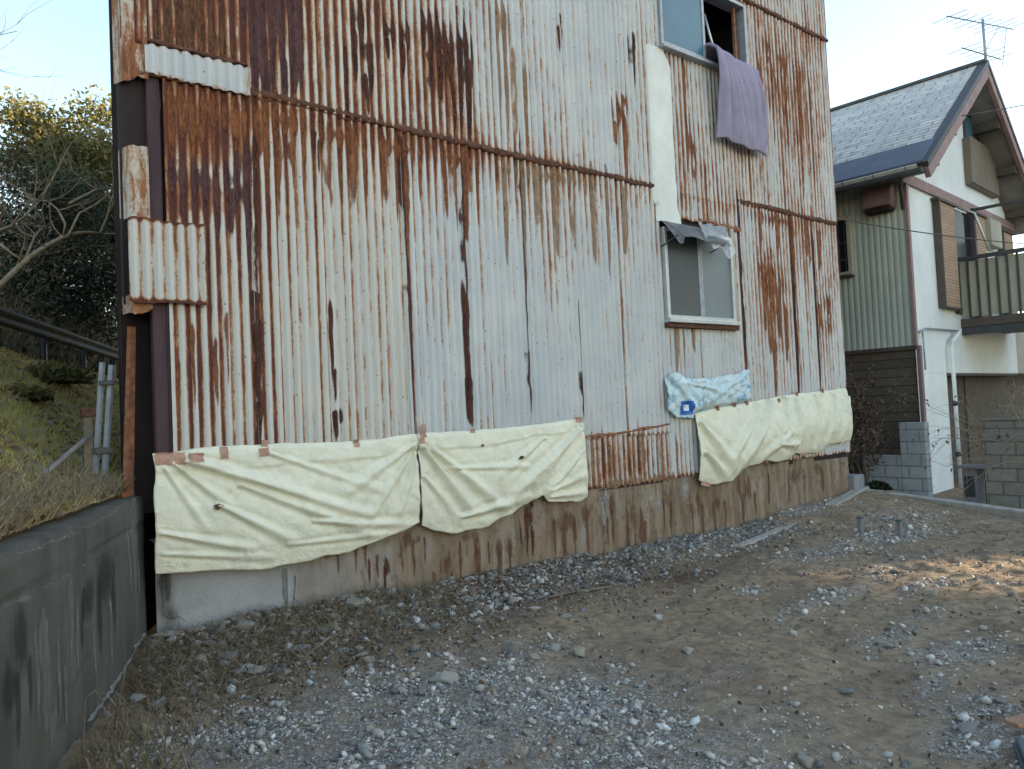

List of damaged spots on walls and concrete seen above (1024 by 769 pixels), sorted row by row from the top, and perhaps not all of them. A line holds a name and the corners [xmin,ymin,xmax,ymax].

corrosion [681,59,720,220]
corrosion [154,0,483,451]
corrosion [488,0,628,413]
corrosion [736,30,833,397]
corrosion [354,533,426,589]
corrosion [433,501,534,583]
corrosion [553,507,591,556]
corrosion [590,431,678,547]
corrosion [691,498,727,535]